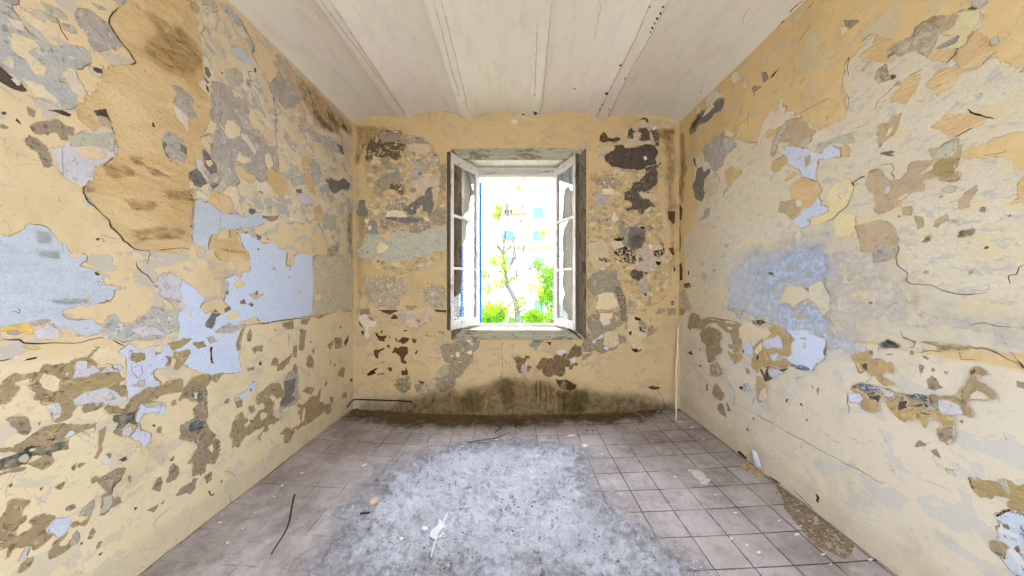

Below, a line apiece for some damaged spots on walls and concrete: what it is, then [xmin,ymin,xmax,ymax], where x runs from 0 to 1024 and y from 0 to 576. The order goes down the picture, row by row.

crack [108,6,139,65]
leakage [147,21,202,71]
crack [83,116,190,283]
peeling [0,0,481,574]
peeling [513,0,1024,576]
crack [895,240,1023,295]
leakage [370,340,671,415]